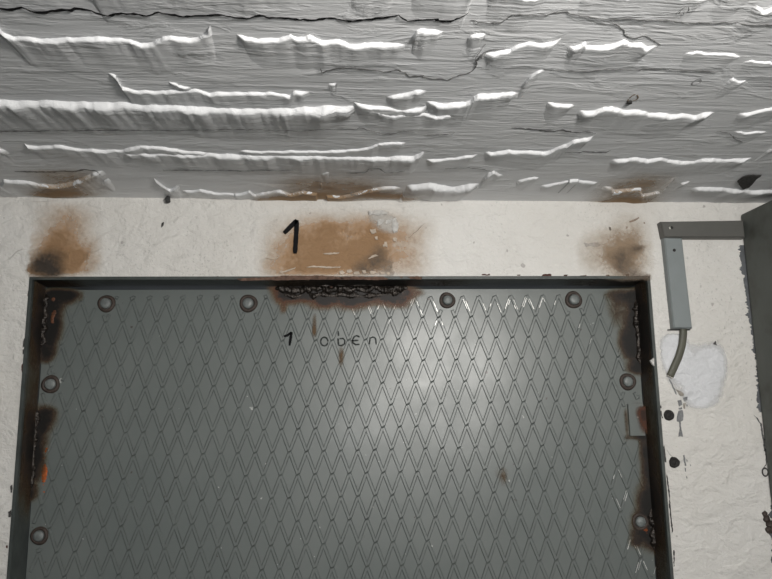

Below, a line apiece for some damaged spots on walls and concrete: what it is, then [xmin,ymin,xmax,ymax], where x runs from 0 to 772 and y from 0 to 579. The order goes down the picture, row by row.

crack [0,7,772,45]
crack [320,45,501,81]
crack [552,66,719,74]
crack [0,126,263,134]
crack [512,127,610,153]
crack [15,168,102,176]
crack [171,167,294,175]
peeling [737,175,762,189]
rust [27,215,91,277]
rust [238,219,411,281]
rust [597,217,650,279]
rust [637,406,647,433]